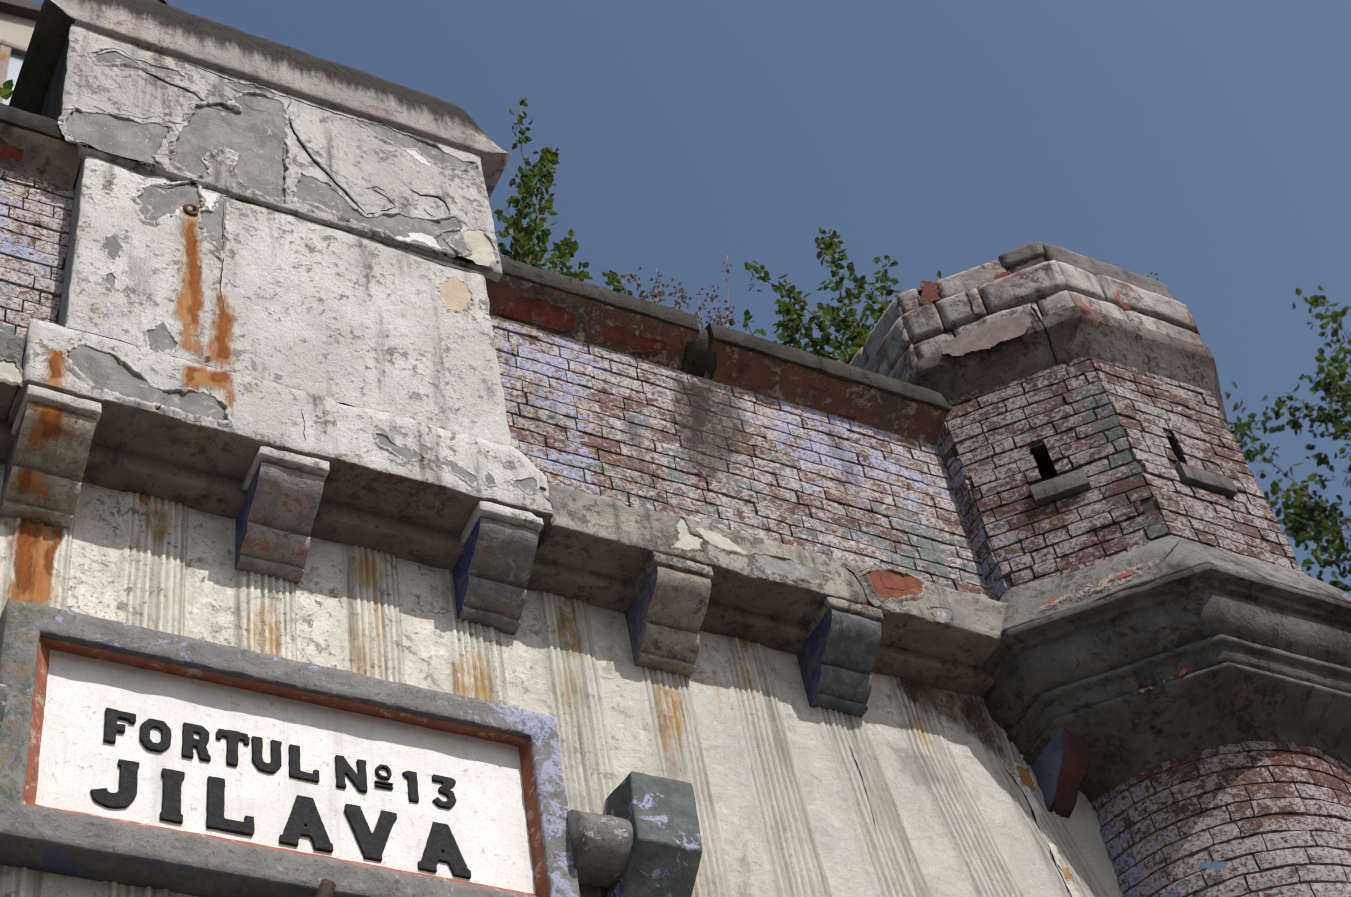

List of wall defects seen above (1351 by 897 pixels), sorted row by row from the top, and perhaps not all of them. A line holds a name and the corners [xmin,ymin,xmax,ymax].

peeling [58,80,501,317]
crack [86,46,475,308]
peeling [141,320,182,354]
rust [175,217,234,406]
peeling [498,293,579,335]
peeling [596,322,669,356]
peeling [942,314,1032,356]
peeling [59,341,234,428]
leakage [677,377,742,475]
rust [6,519,63,605]
peeling [861,566,955,625]